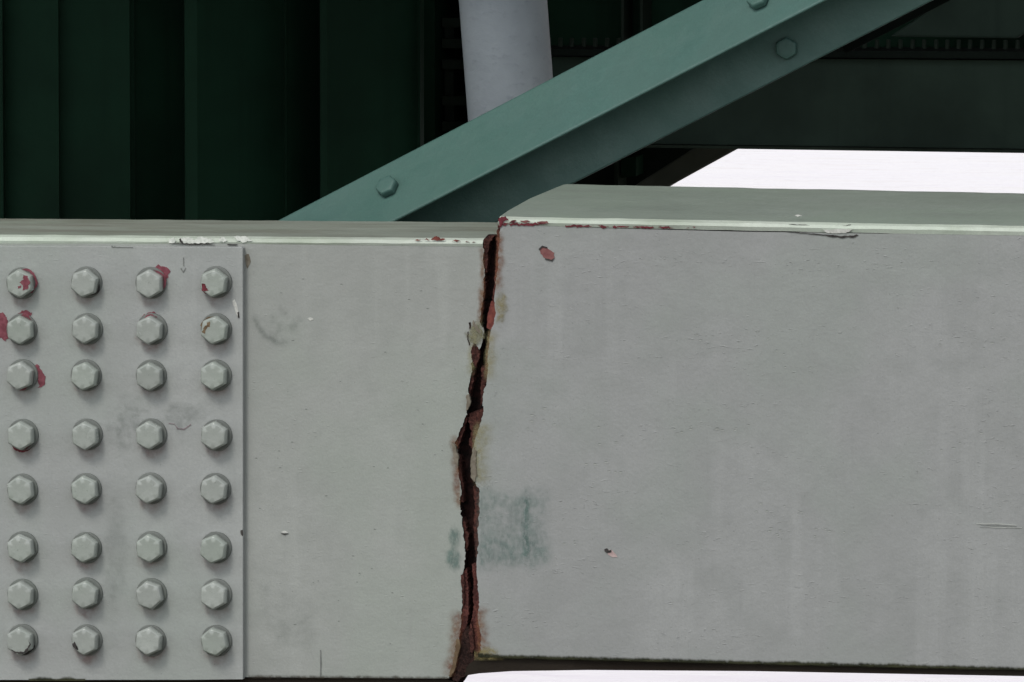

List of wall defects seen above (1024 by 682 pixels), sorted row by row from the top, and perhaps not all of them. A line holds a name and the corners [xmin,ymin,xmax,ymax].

peeling [498,216,548,227]
peeling [539,246,555,261]
peeling [18,268,38,293]
peeling [154,264,171,289]
peeling [0,310,32,341]
peeling [20,364,46,391]
crack [449,218,500,682]